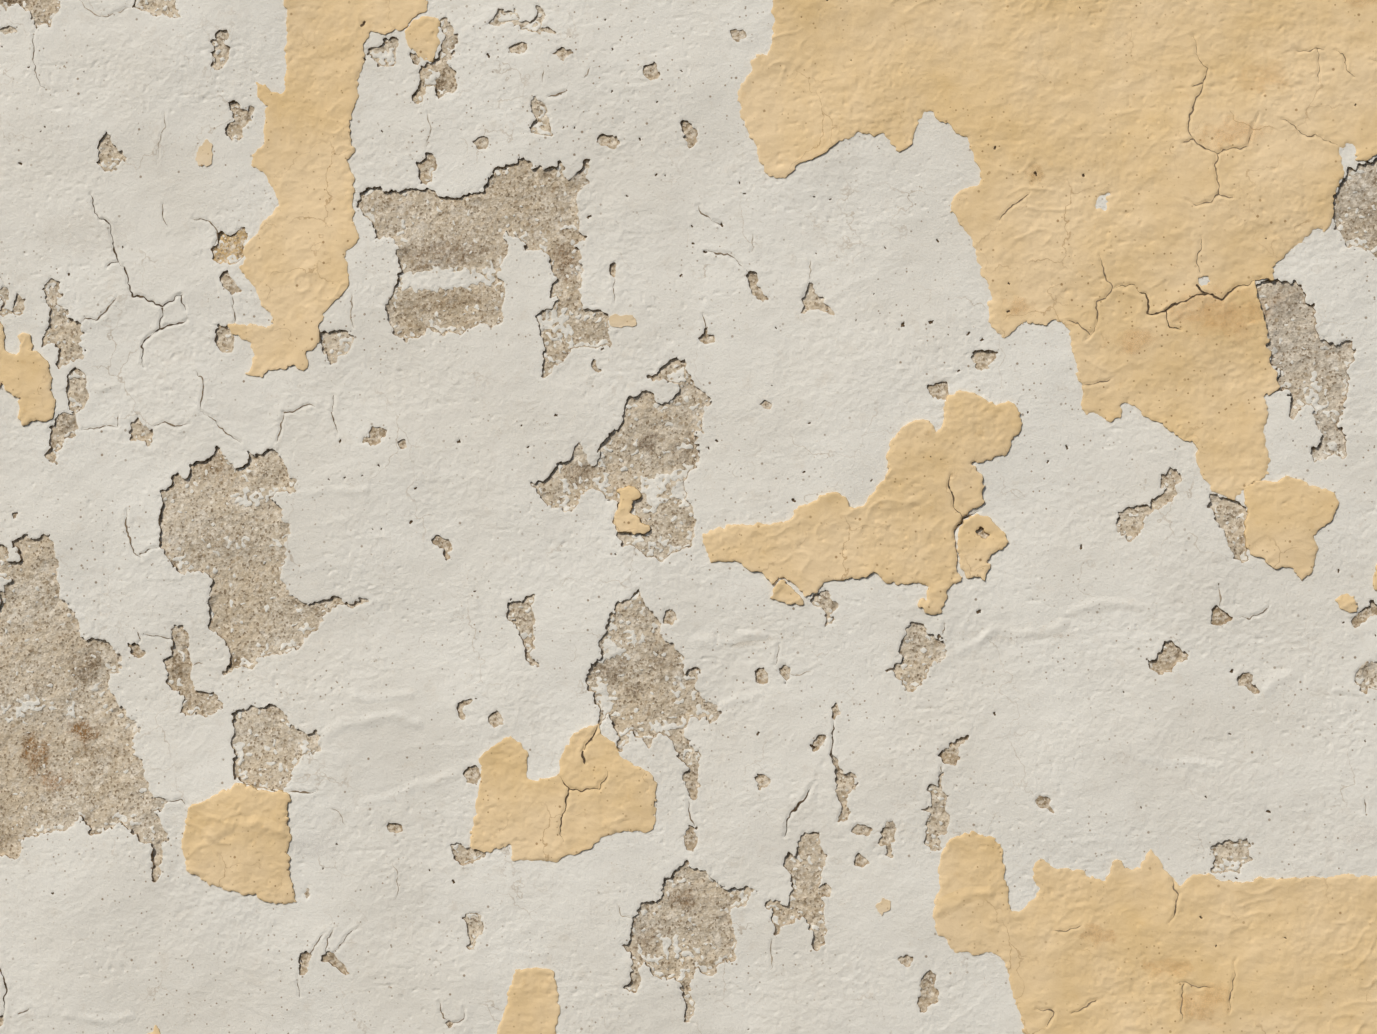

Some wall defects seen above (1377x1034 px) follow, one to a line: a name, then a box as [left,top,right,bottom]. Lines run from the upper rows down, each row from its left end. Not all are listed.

spalling [0,0,61,47]
crack [84,197,187,366]
crack [162,204,218,243]
peeling [195,0,637,378]
peeling [530,0,1377,694]
crack [1069,239,1261,339]
crack [1184,47,1250,206]
spalling [160,446,369,675]
spalling [0,534,321,904]
crack [560,728,608,837]
peeling [451,590,722,865]
spalling [622,825,832,1022]